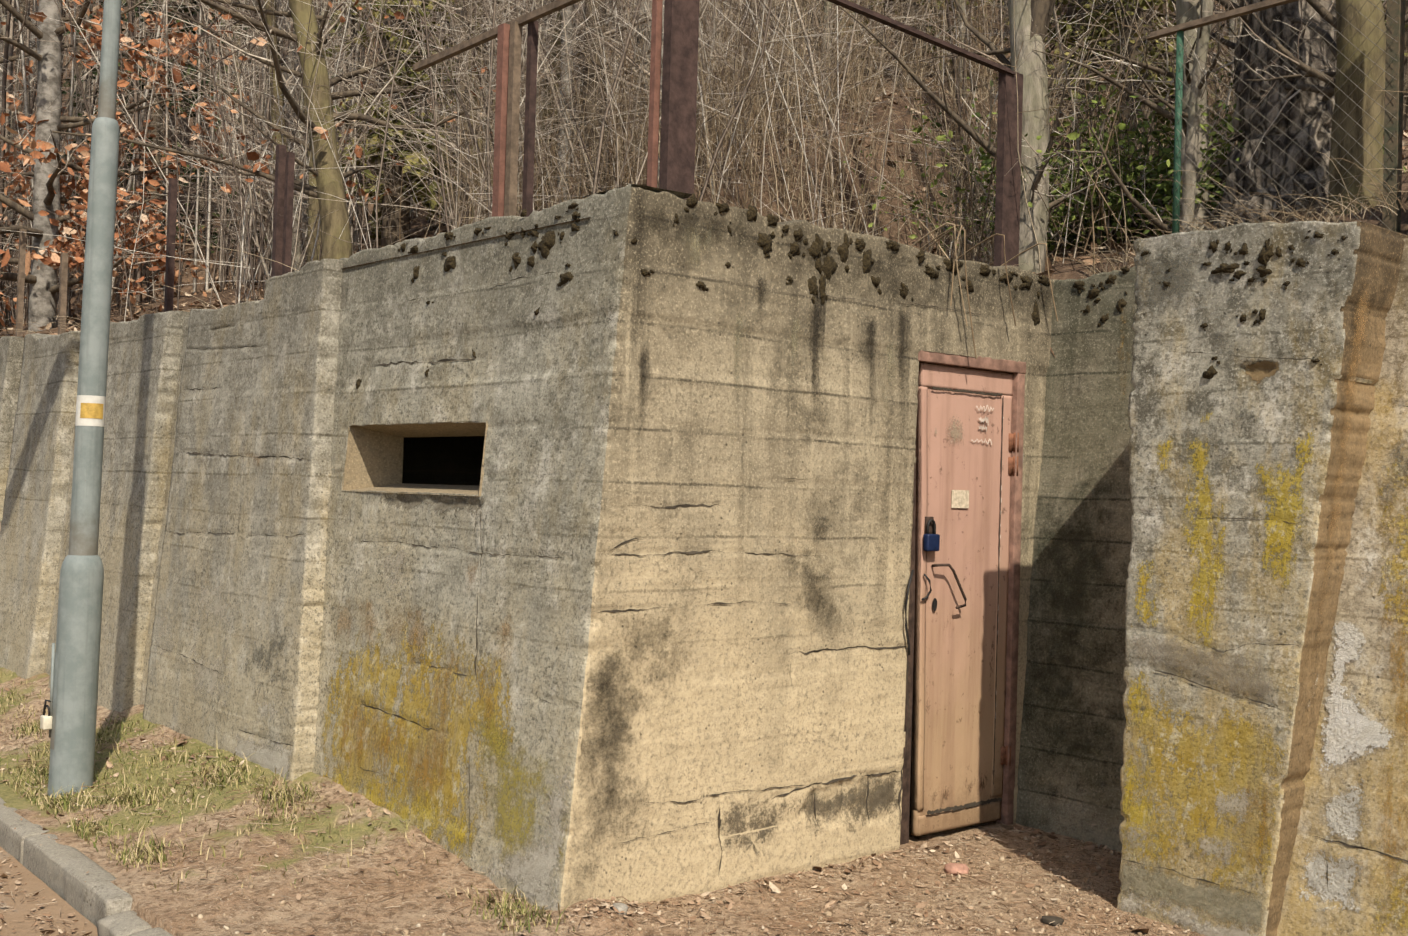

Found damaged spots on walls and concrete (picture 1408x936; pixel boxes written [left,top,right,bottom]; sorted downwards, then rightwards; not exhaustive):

leakage [639,353,647,400]
leakage [793,292,825,388]
leakage [867,313,909,403]
spalling [1244,360,1280,385]
leakage [581,658,636,833]
crack [623,646,910,877]